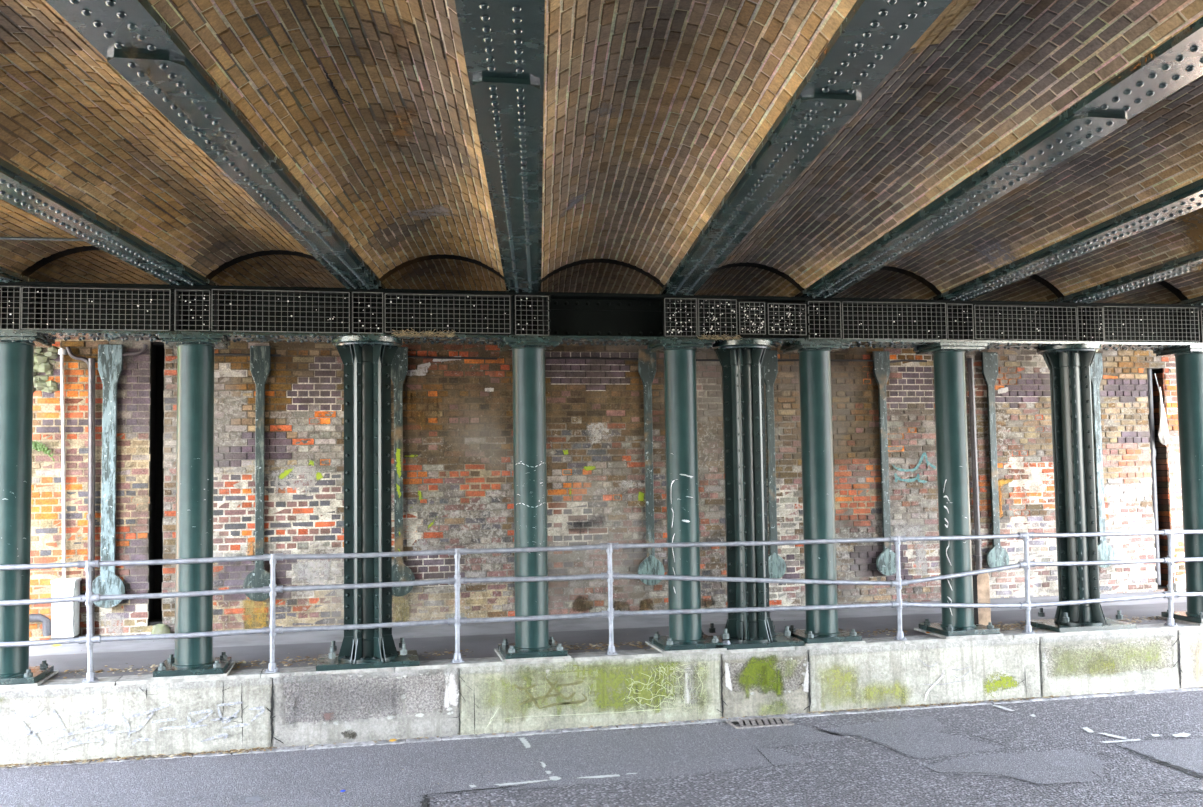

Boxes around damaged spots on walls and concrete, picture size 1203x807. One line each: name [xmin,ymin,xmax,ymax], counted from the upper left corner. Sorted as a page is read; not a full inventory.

water stain [681,661,702,706]
water stain [725,662,749,699]